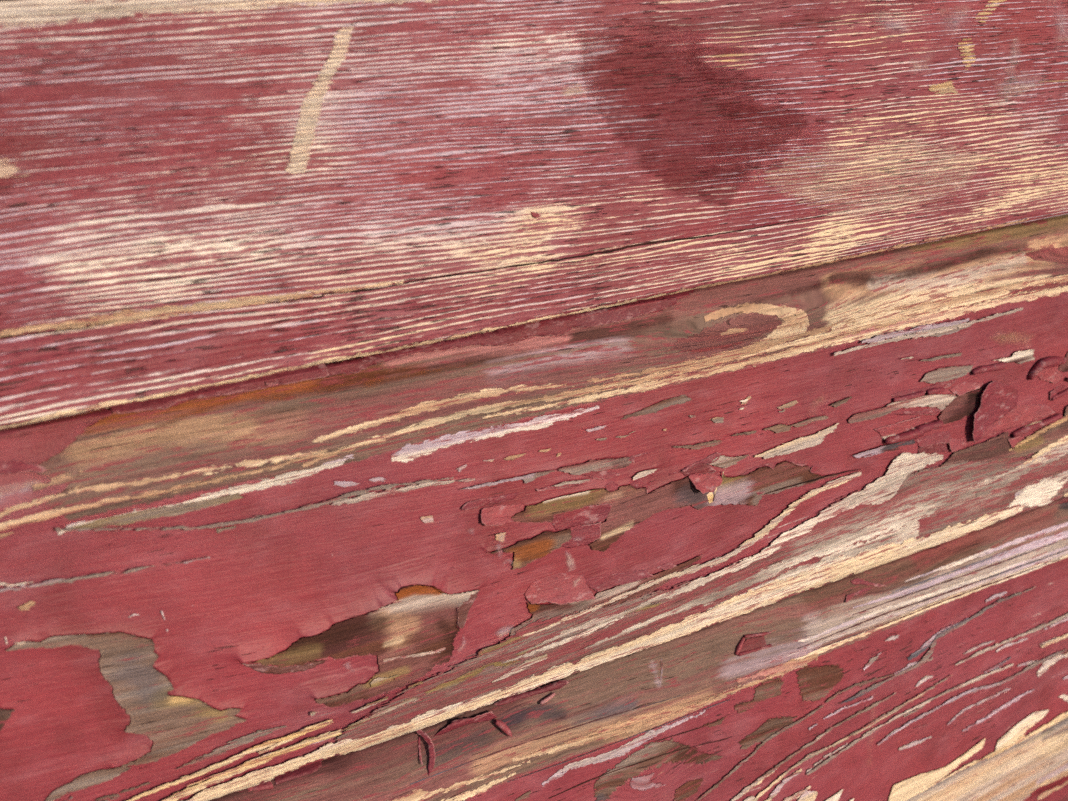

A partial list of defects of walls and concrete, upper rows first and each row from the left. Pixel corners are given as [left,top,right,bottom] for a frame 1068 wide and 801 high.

peeling [460,349,1068,570]
peeling [334,477,386,487]
peeling [243,584,487,707]
peeling [735,631,772,656]
peeling [0,709,15,730]
peeling [6,632,246,801]
peeling [704,678,784,728]
peeling [739,715,798,749]
peeling [796,663,844,704]
peeling [246,761,322,791]
peeling [798,789,854,801]
peeling [889,710,1049,801]